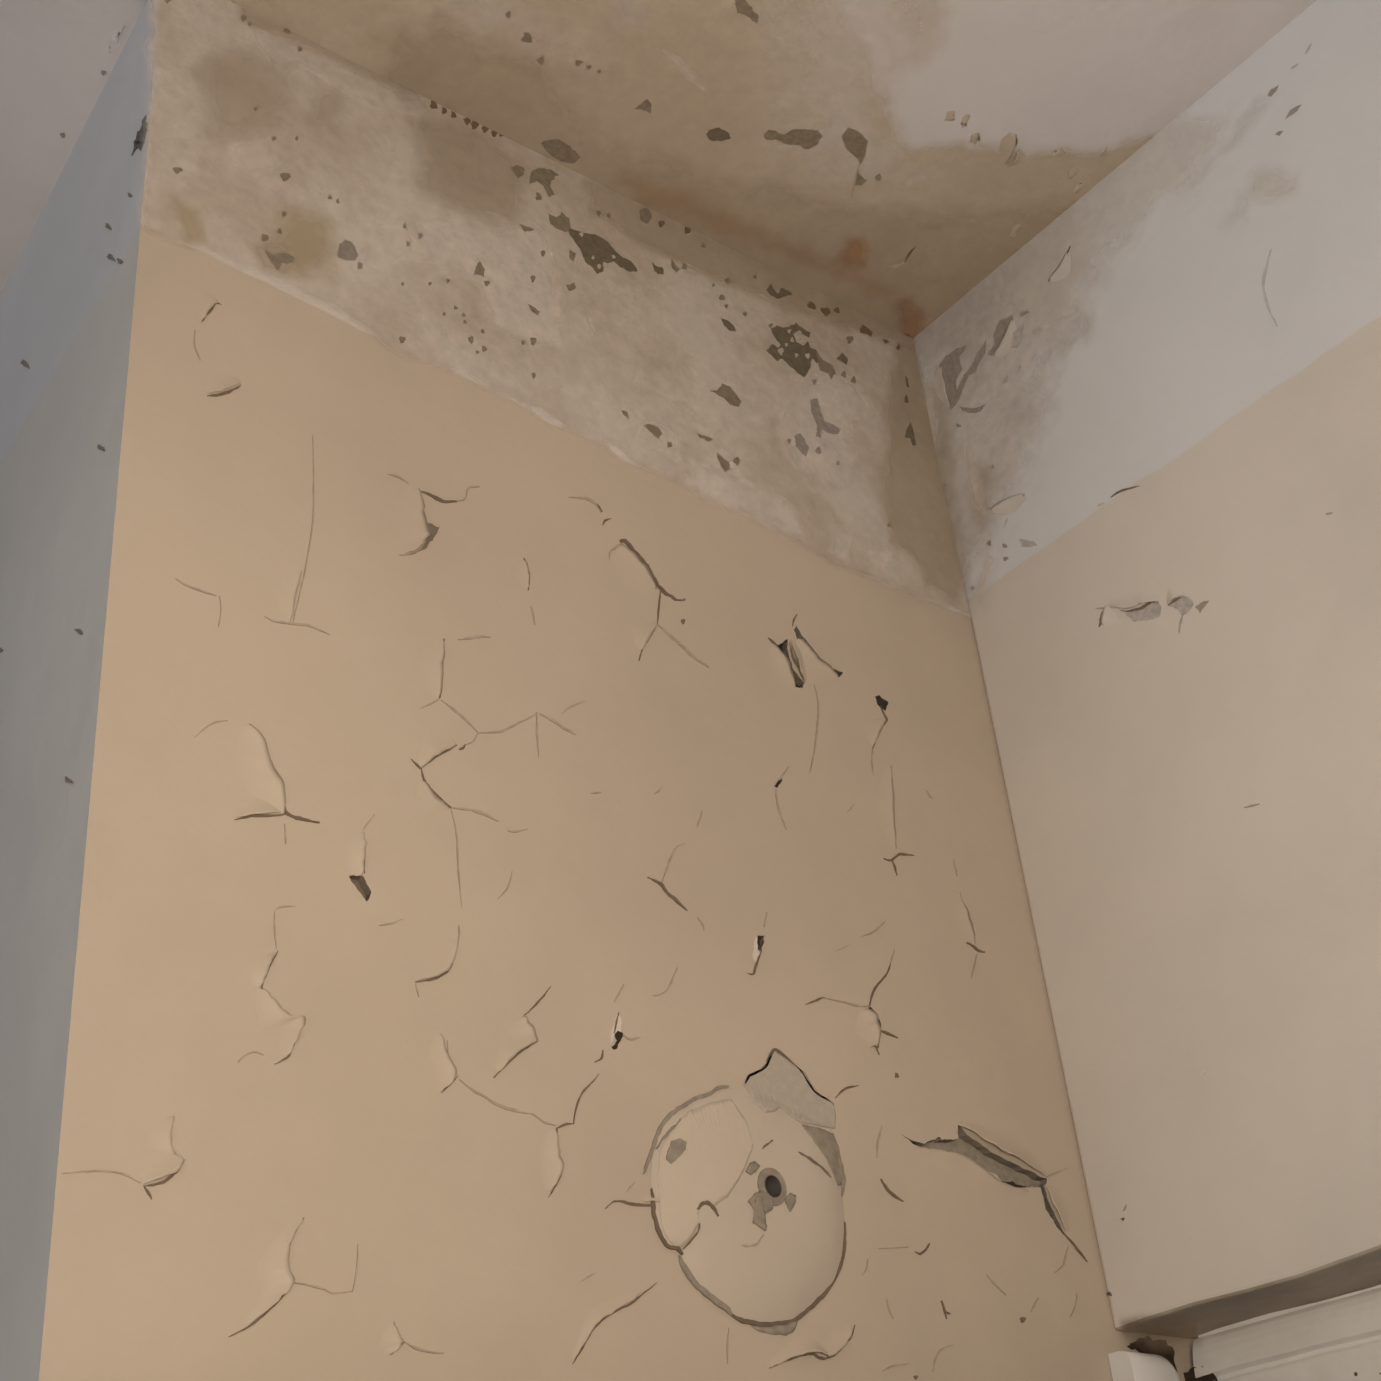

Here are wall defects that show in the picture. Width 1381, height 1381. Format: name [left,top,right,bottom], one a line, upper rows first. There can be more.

peeling [511,139,687,274]
peeling [764,129,822,149]
peeling [842,127,881,198]
damp [144,0,1151,613]
peeling [766,323,910,457]
peeling [933,310,1042,427]
crack [568,496,709,668]
crack [411,635,585,997]
crack [647,810,704,931]
crack [848,695,934,875]
crack [682,1200,719,1250]
peeling [907,1117,1088,1273]